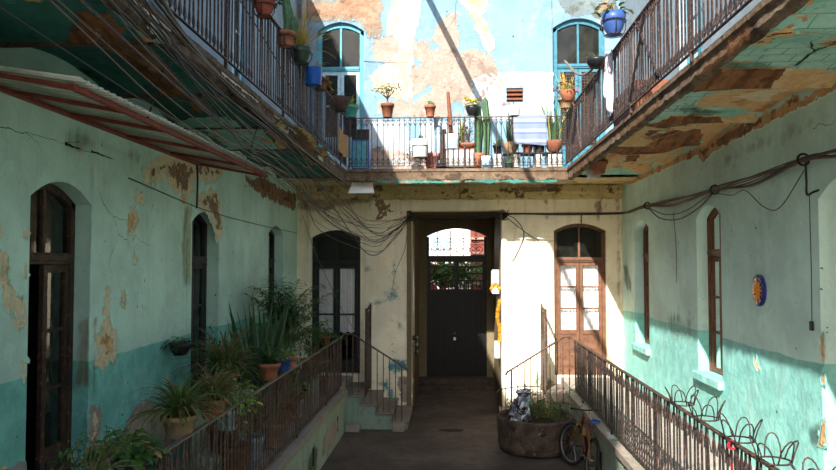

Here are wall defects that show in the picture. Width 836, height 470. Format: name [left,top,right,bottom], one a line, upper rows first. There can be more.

crack [0,127,113,160]
flaking render [65,0,335,165]
peeling [298,0,504,119]
flaking render [601,66,836,186]
crack [794,38,836,66]
peeling [125,153,224,244]
flaking render [244,174,297,212]
peeling [0,222,28,335]
peeling [22,261,31,281]
peeling [19,356,30,386]
peeling [92,283,129,378]
peeling [817,417,829,450]